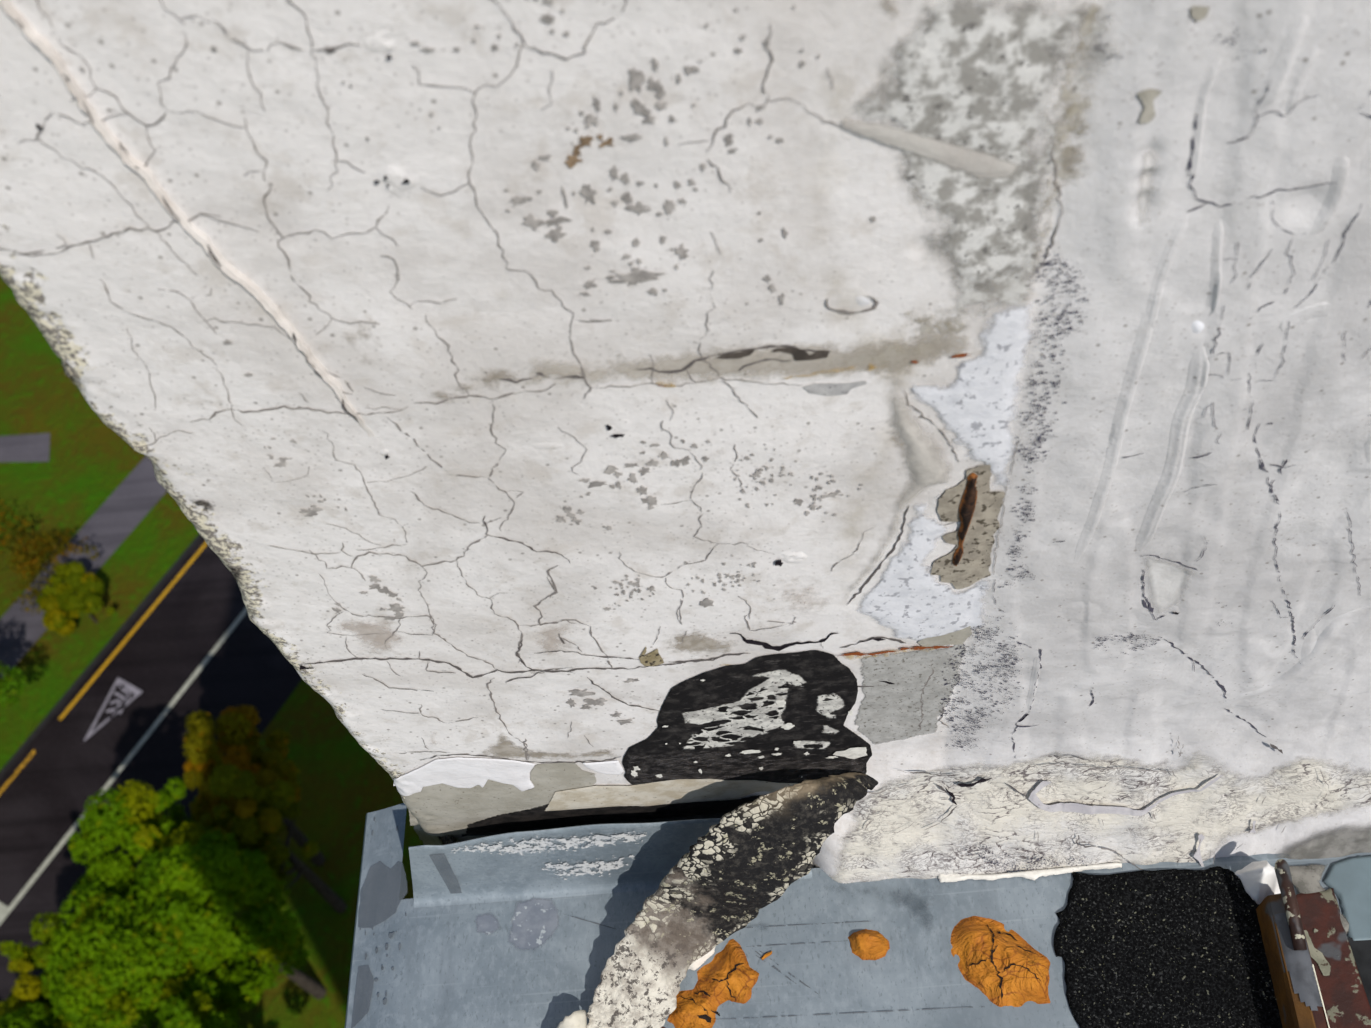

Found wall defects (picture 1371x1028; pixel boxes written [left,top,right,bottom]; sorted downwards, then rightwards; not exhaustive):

leakage [1049,5,1123,201]
crack [1228,82,1320,143]
crack [1030,145,1063,279]
crack [0,0,909,763]
peeling [663,0,1108,774]
crack [904,391,959,461]
crack [1185,118,1362,664]
peeling [405,762,596,845]
peeling [594,575,655,611]
crack [858,642,1183,834]
crack [1071,820,1143,870]
crack [1140,548,1283,754]